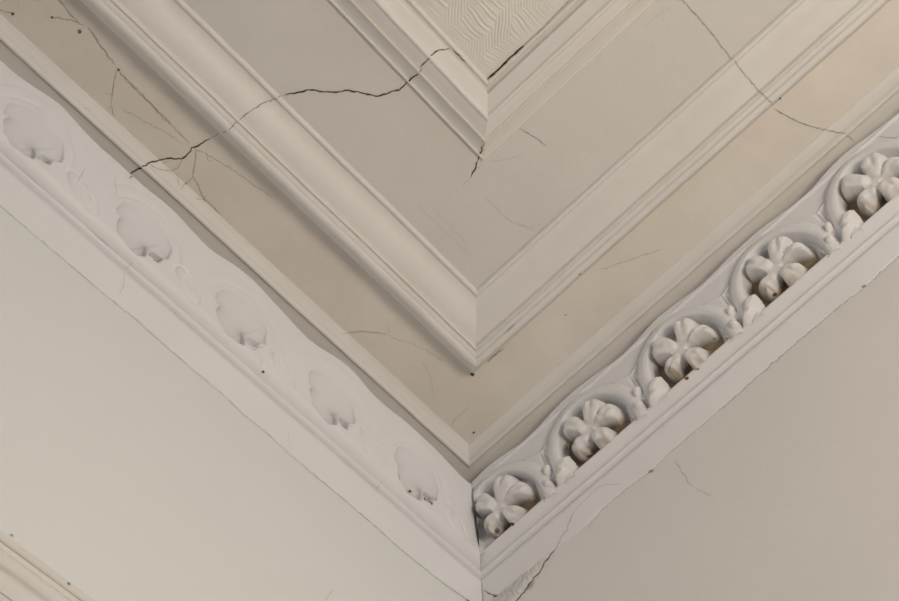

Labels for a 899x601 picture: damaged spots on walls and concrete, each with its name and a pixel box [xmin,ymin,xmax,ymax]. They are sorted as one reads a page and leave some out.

crack [130,48,464,177]
crack [488,45,524,79]